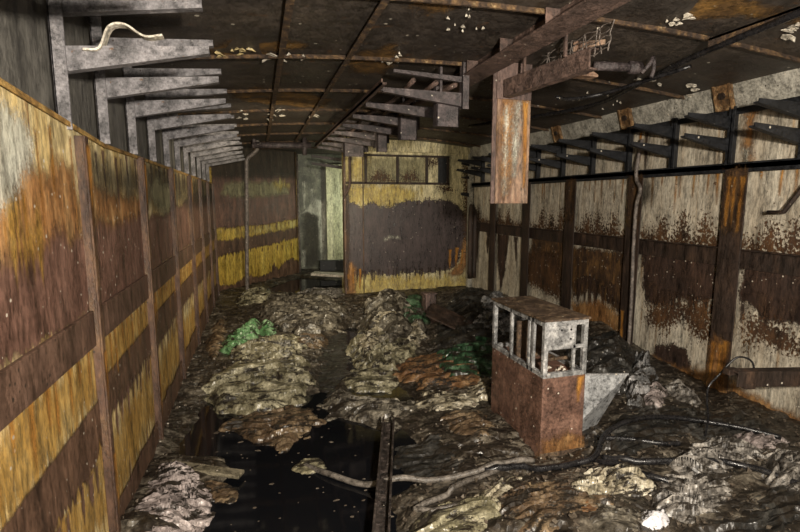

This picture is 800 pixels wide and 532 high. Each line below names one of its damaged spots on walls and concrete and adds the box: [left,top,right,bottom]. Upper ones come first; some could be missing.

rust [0,126,90,369]
rust [86,145,176,303]
rust [342,154,468,294]
leakage [343,197,467,283]
rust [477,100,800,292]
rust [640,254,800,421]
rust [542,434,584,454]